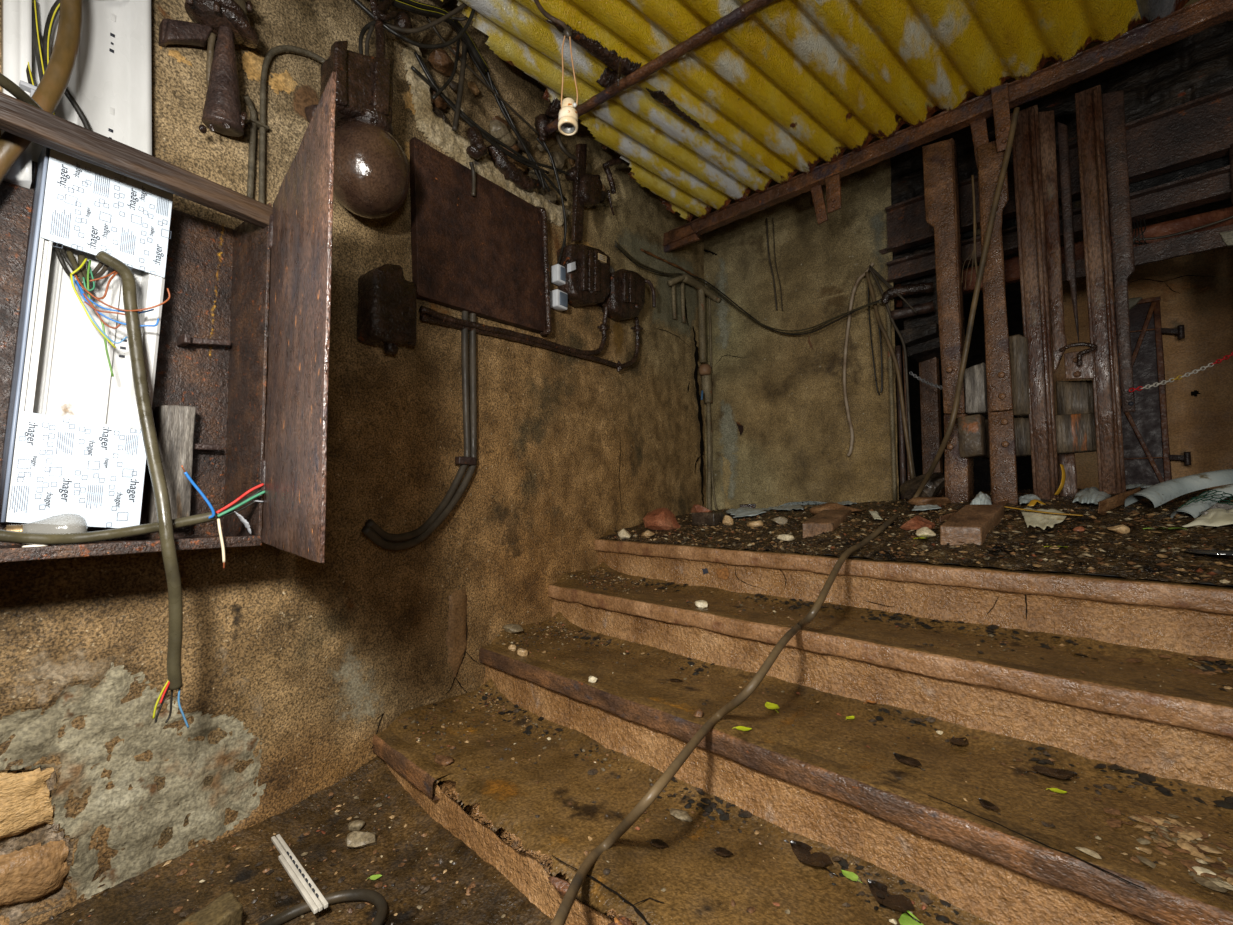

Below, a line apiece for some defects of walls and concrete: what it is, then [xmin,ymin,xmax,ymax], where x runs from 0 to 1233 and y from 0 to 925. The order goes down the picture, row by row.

crack [653,298,742,506]
flaking render [0,662,266,900]